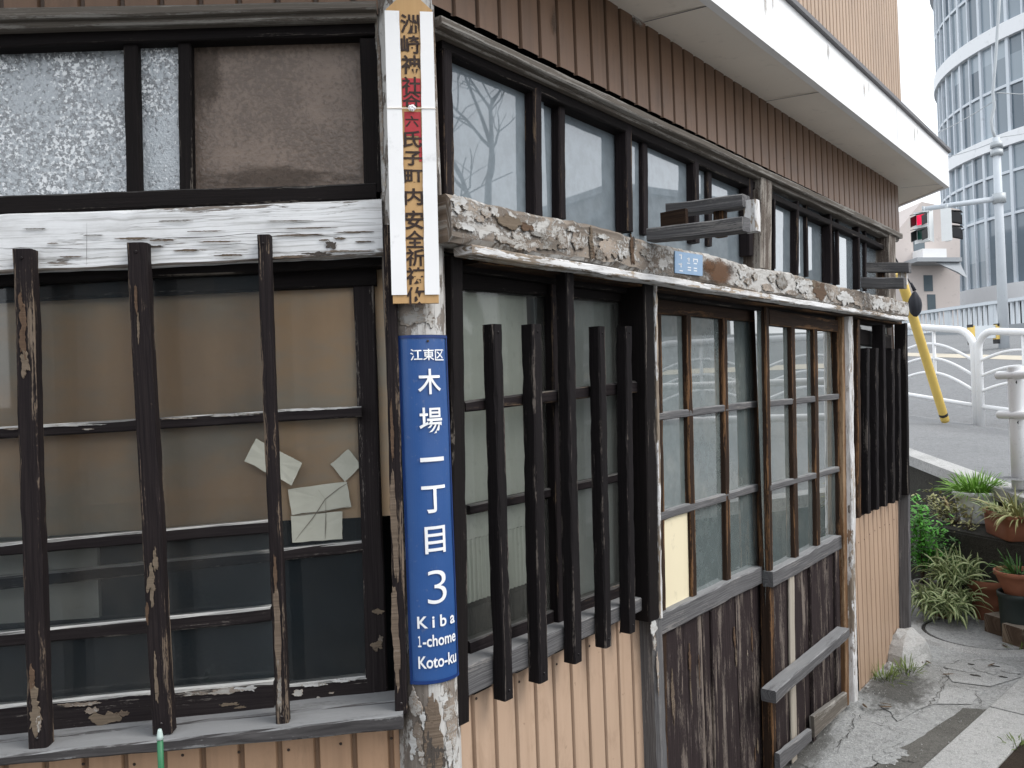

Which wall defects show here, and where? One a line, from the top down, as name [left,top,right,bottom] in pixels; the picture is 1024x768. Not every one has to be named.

peeling [432,10,668,272]
peeling [114,220,242,256]
peeling [272,220,375,259]
peeling [18,292,30,379]
peeling [145,548,158,625]
peeling [370,401,458,768]
peeling [28,664,43,738]
peeling [57,701,130,726]
peeling [183,685,257,709]